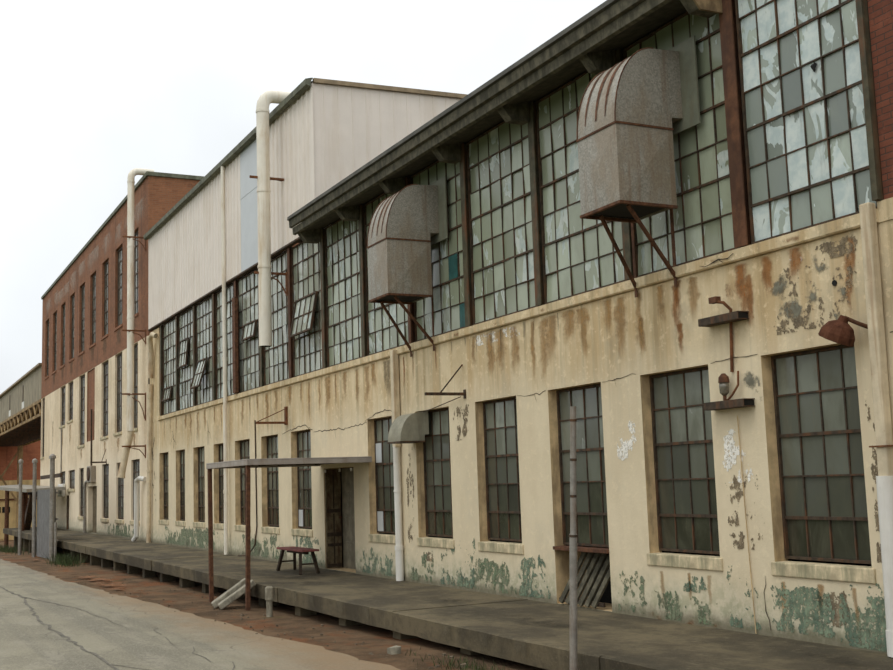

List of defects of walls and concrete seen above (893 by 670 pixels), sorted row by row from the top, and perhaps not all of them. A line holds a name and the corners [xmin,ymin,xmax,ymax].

peeling [769,235,857,335]
rust [636,294,644,345]
crack [283,409,392,437]
peeling [453,404,469,441]